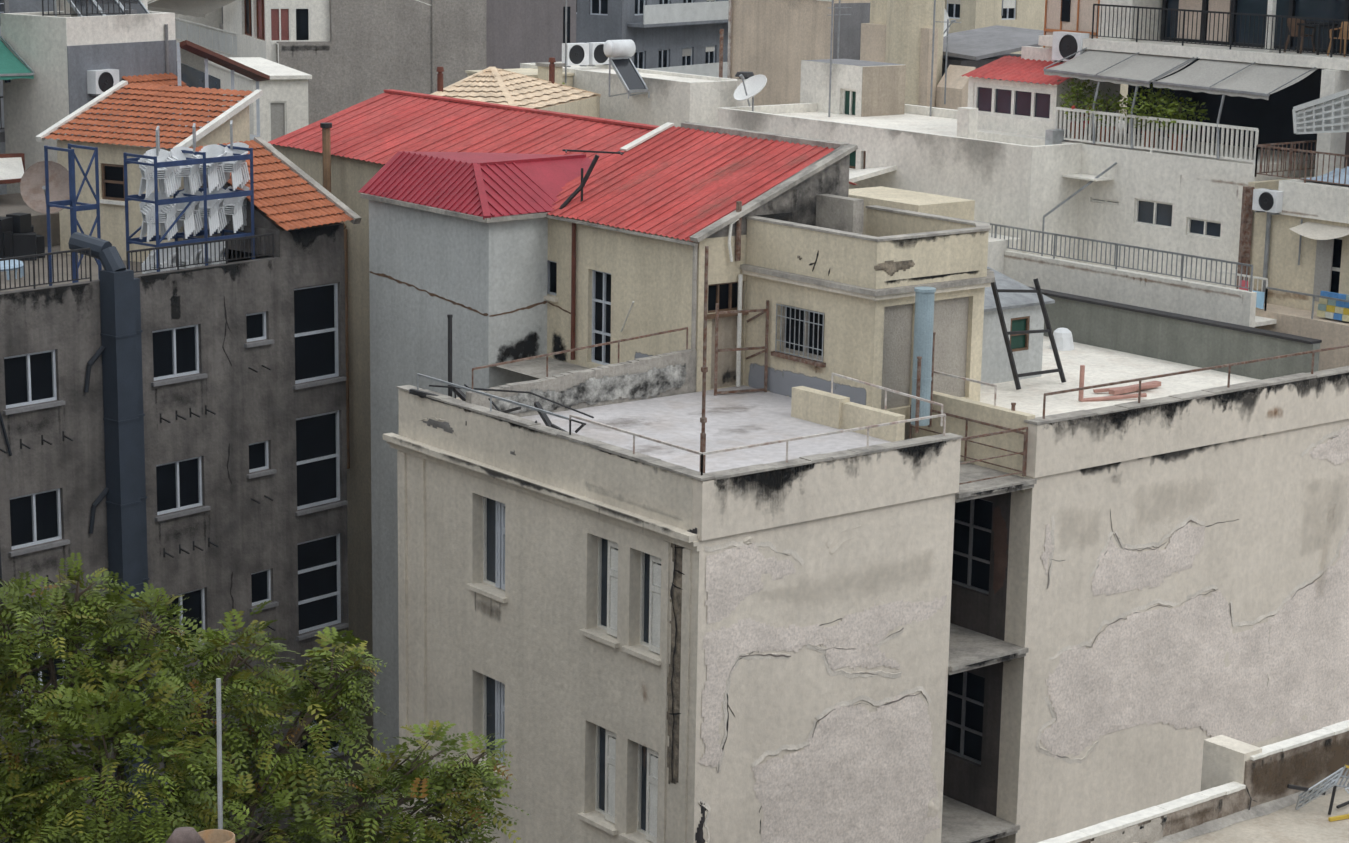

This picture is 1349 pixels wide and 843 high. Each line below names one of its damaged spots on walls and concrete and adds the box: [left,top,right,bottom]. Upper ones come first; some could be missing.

crack [370,271,576,317]
water stain [1049,372,1349,433]
water stain [899,440,949,463]
water stain [715,462,819,499]
peeling [667,528,697,784]
peeling [820,632,902,678]
flaking render [1036,515,1349,764]
flaking render [695,798,711,843]